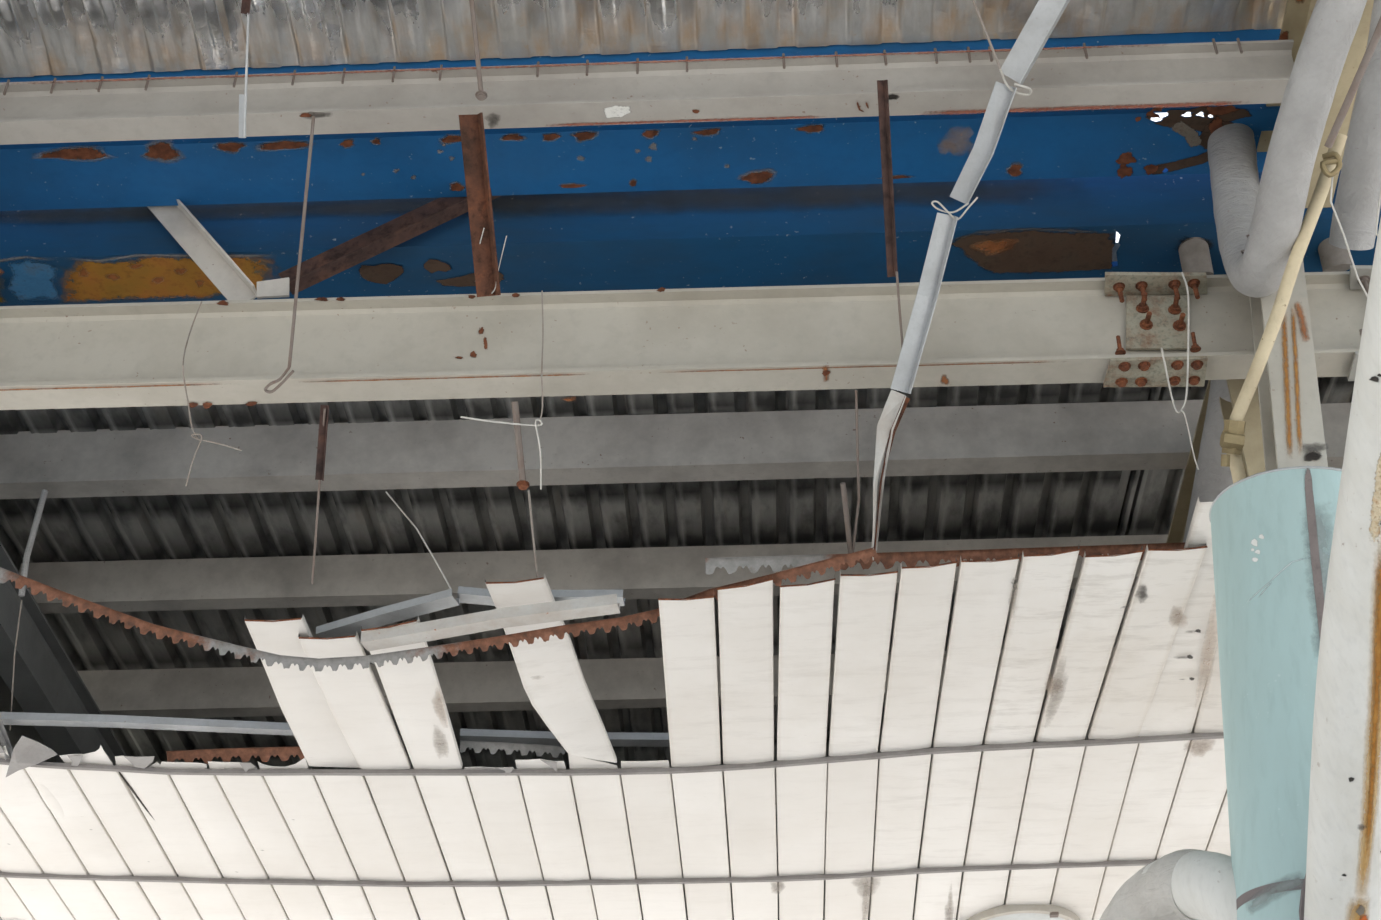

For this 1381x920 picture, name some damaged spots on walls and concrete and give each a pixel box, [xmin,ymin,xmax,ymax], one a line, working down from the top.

rust [40,147,108,161]
rust [144,141,180,162]
rust [218,141,309,153]
rust [441,135,461,144]
rust [489,116,525,141]
rust [543,110,823,142]
rust [1008,102,1239,134]
rust [741,169,774,184]
rust [951,228,1114,273]
peeling [1369,454,1381,541]
rust [1359,565,1381,885]
rust [1349,904,1368,920]